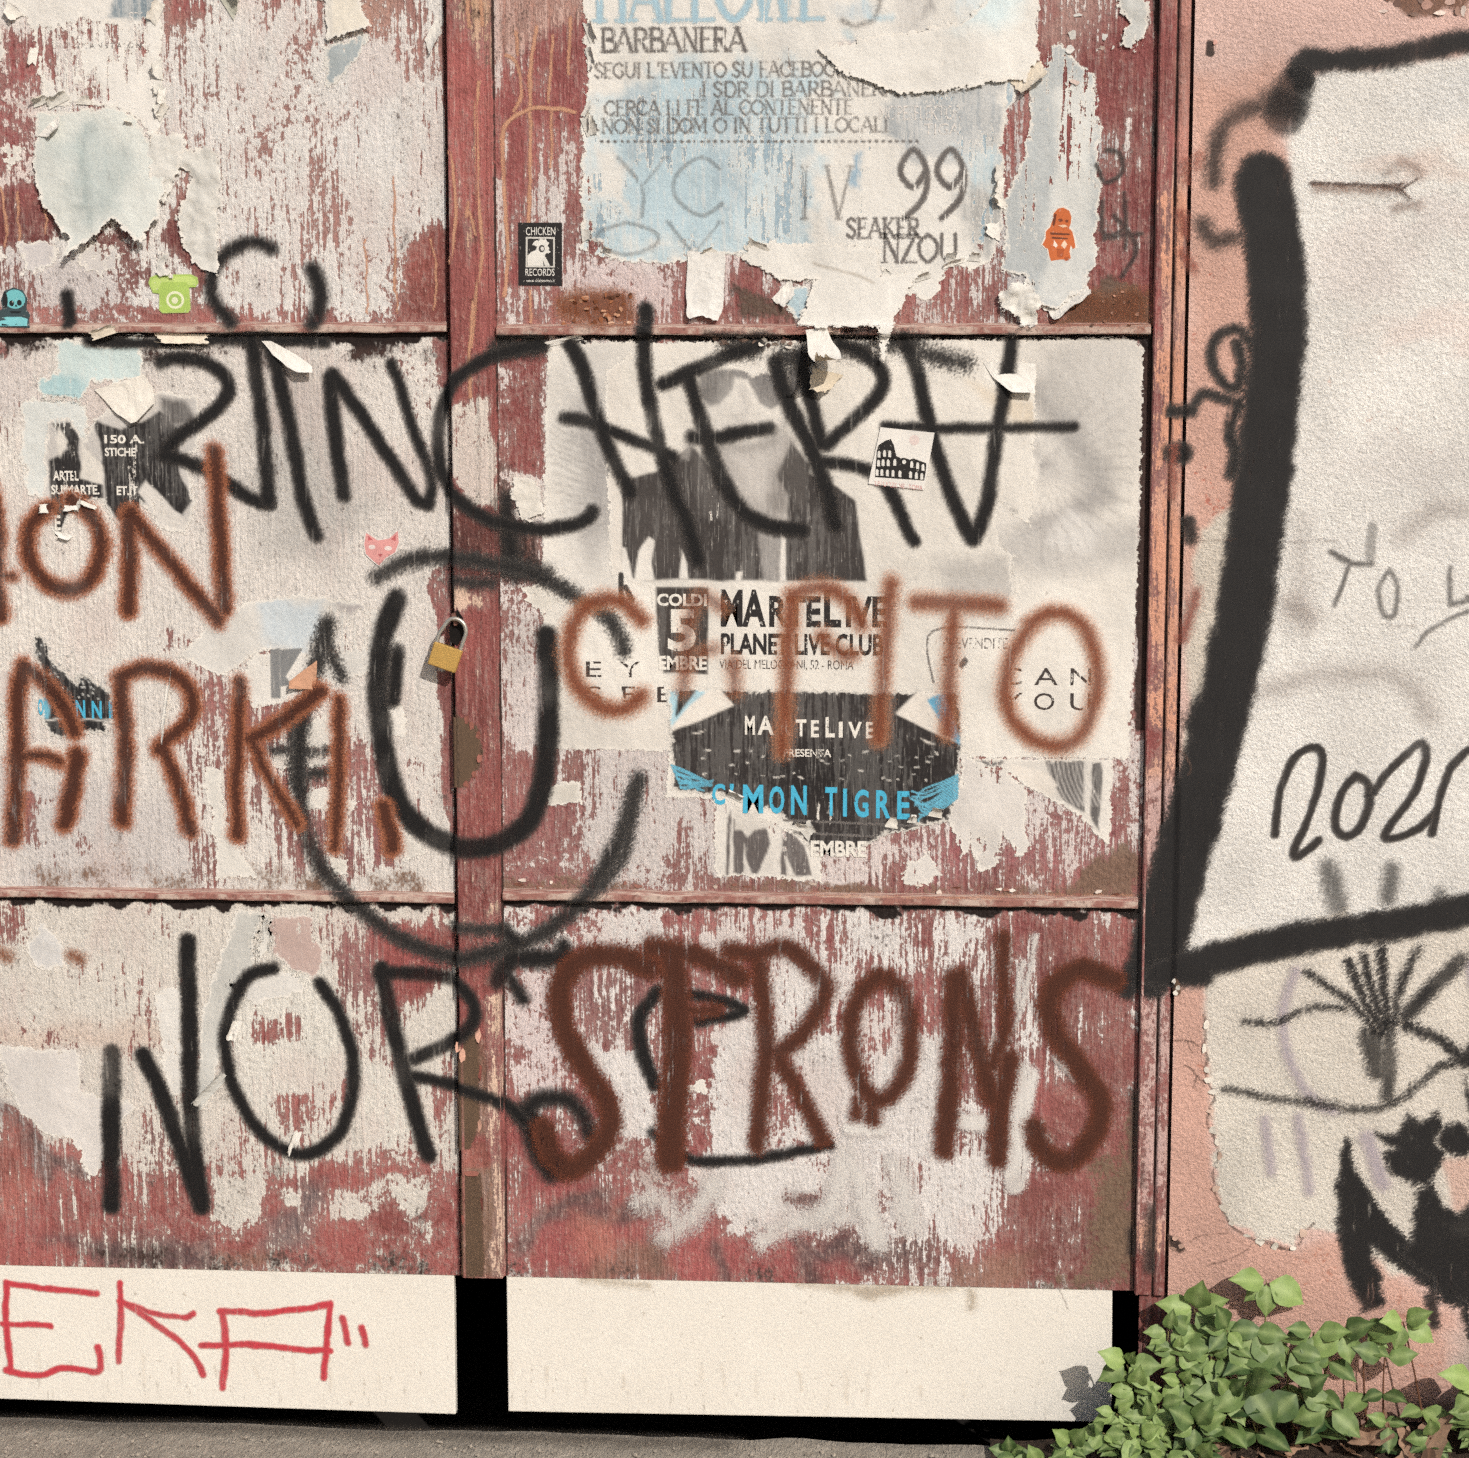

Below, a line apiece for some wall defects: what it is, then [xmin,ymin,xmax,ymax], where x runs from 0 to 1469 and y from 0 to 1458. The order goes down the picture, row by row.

flaking render [1379,0,1468,18]
peeling [1065,13,1082,54]